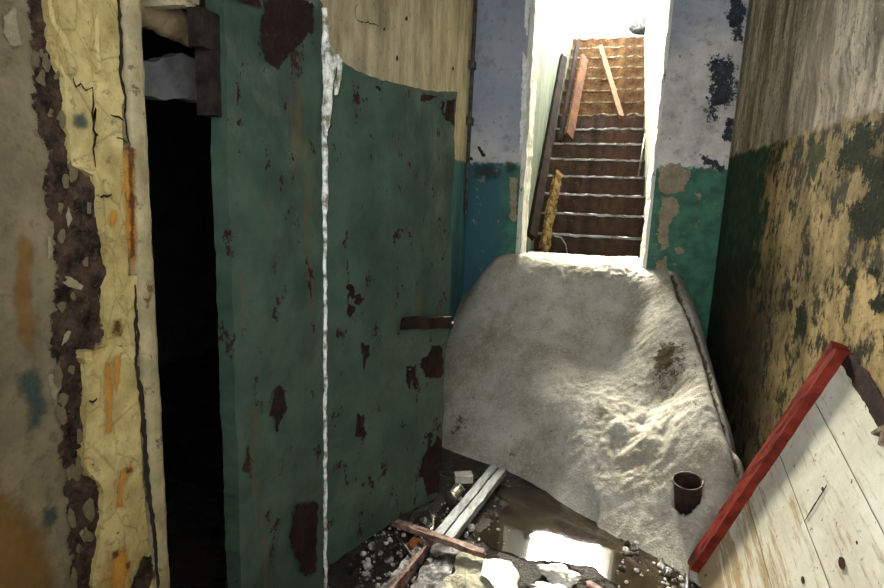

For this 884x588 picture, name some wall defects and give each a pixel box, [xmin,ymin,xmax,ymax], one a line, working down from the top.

crack [73,0,131,167]
peeling [655,163,691,270]
peeling [807,135,827,182]
peeling [832,116,884,241]
peeling [3,0,154,588]